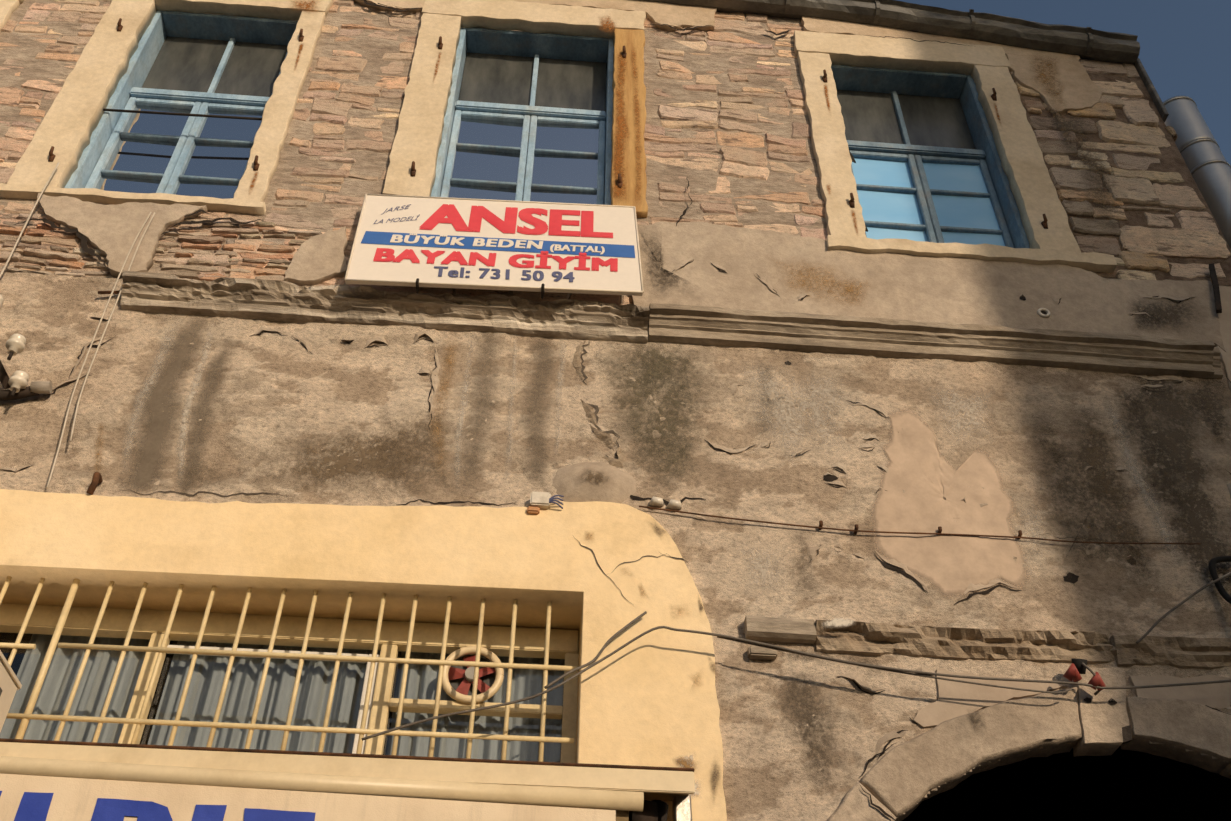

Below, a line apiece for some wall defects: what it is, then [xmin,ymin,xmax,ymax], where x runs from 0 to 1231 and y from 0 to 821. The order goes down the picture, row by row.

corrosion [613,53,640,197]
peeling [801,16,1103,115]
peeling [0,193,348,286]
leakage [127,324,228,491]
leakage [528,341,565,471]
leakage [611,348,697,470]
peeling [807,400,1026,605]
crack [574,537,689,604]
crack [859,743,896,821]